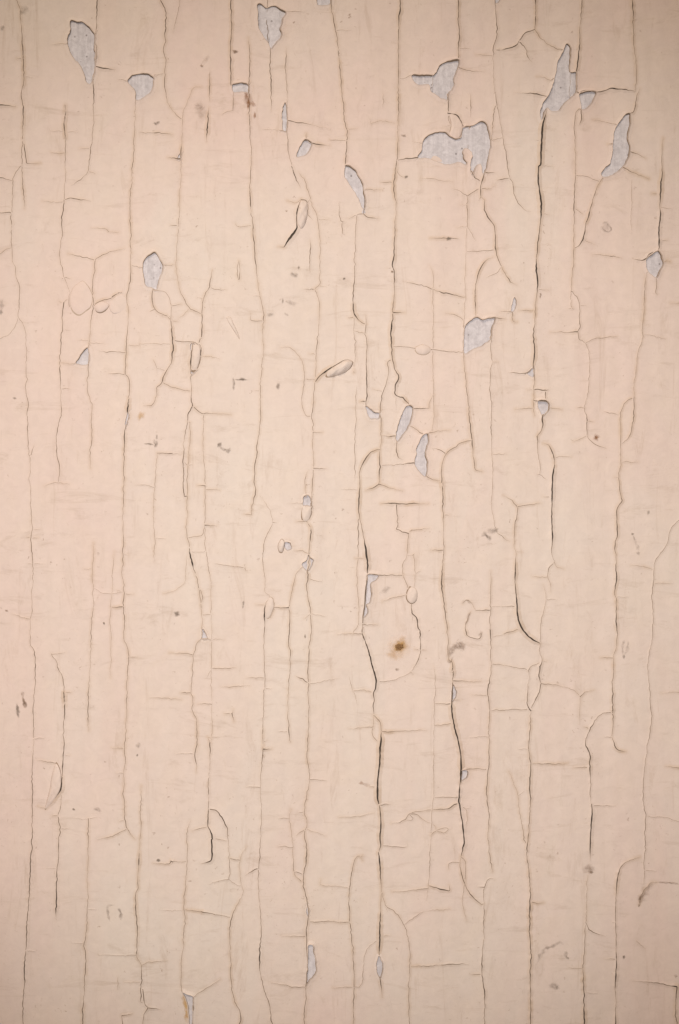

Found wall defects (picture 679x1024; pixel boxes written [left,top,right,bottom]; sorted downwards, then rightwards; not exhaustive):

peeling [64,17,99,88]
peeling [254,0,289,52]
peeling [408,56,463,104]
peeling [536,41,599,123]
peeling [414,118,494,180]
peeling [597,110,634,181]
peeling [341,162,369,212]
crack [43,43,115,487]
peeling [460,296,518,357]
crack [0,0,71,1024]
crack [68,0,303,1024]
crack [262,0,679,1024]